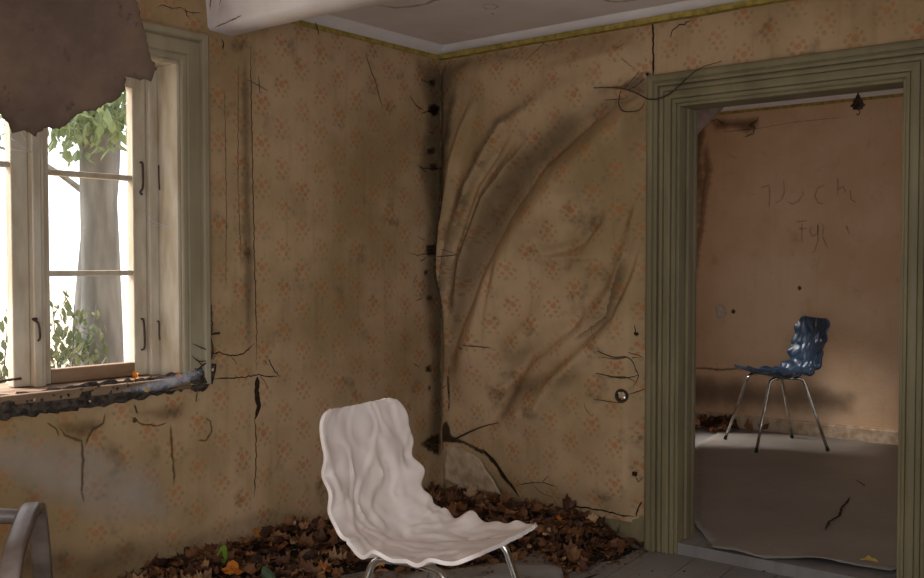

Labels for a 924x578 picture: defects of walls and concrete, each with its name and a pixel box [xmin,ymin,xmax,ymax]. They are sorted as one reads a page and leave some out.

flaking render [0,364,217,421]
crack [211,344,279,387]